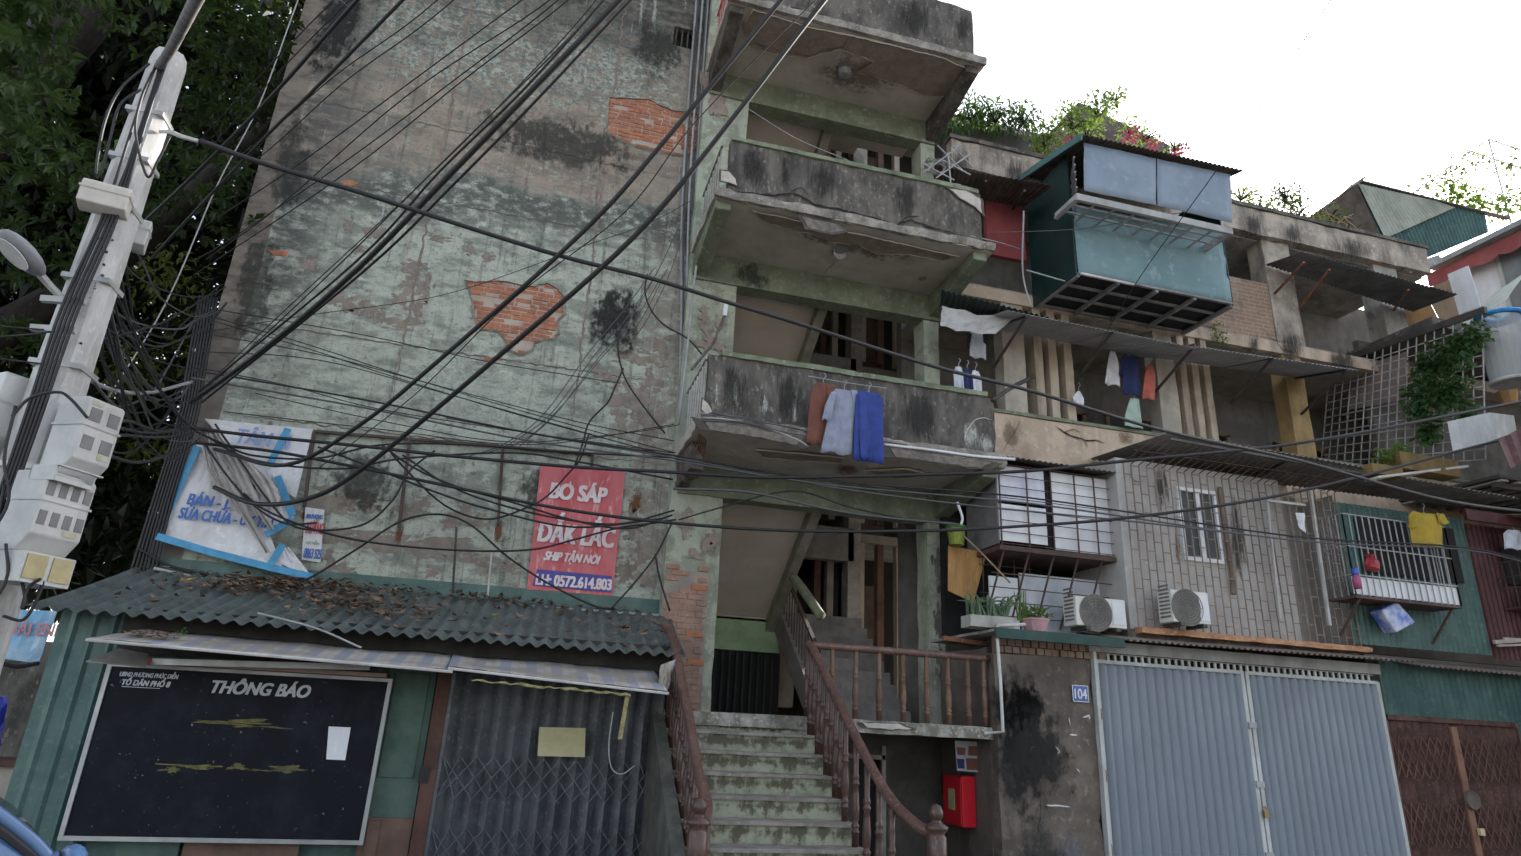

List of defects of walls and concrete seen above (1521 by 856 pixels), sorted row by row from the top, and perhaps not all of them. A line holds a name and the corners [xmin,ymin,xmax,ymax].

water stain [485,110,629,171]
spalling [604,71,728,157]
peeling [428,232,496,263]
spalling [464,279,567,362]
water stain [589,290,638,354]
flaking render [614,486,720,711]
water stain [991,668,1075,856]